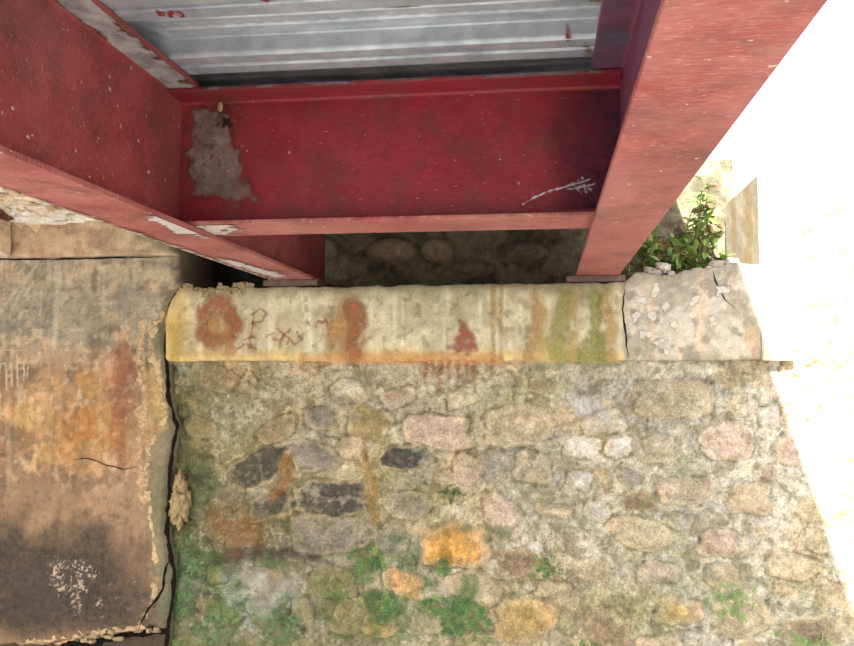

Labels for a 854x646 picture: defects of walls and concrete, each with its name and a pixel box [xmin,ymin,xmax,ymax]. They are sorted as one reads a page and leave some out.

peeling [56,0,239,90]
peeling [484,70,602,78]
peeling [185,107,259,208]
peeling [0,187,289,297]
rust [196,295,242,355]
rust [328,300,365,363]
crack [75,458,138,477]
flaking render [135,310,173,564]
water stain [46,559,100,615]
spalling [25,582,165,646]